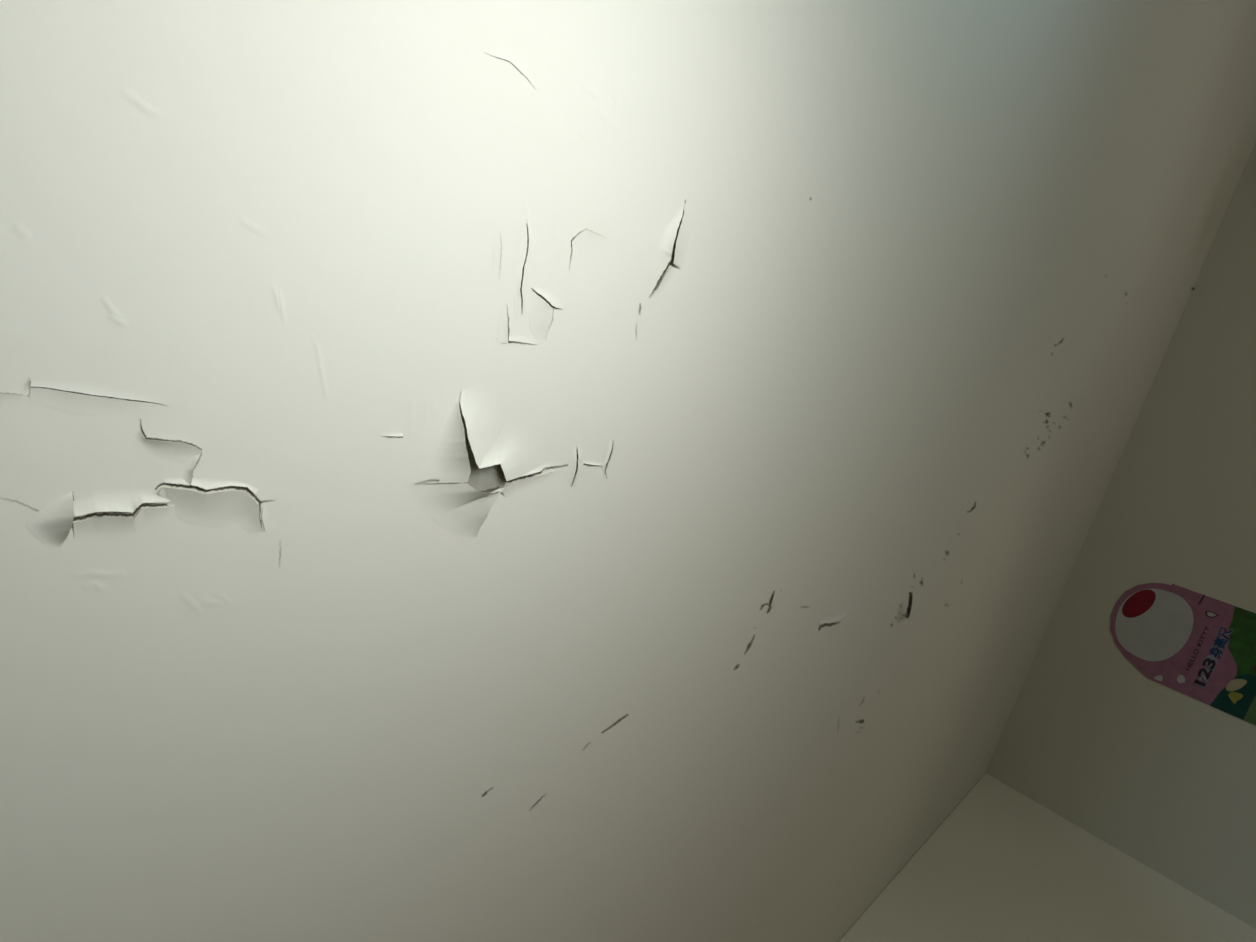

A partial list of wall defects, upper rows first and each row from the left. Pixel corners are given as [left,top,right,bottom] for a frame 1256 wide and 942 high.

crack [0,377,170,417]
peeling [26,425,271,548]
peeling [411,384,551,538]